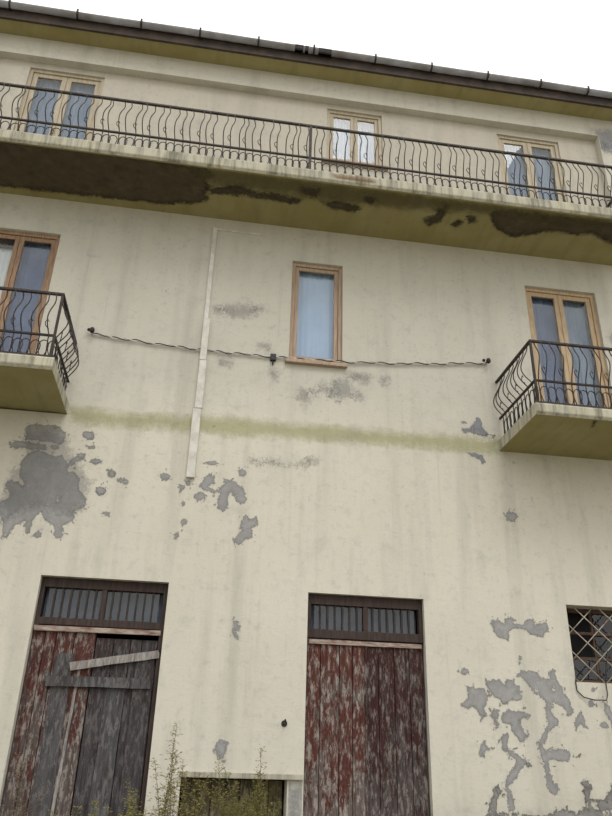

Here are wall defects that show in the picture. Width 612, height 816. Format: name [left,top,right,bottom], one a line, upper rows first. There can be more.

water stain [194,168,612,226]
peeling [461,417,495,438]
peeling [0,420,129,541]
peeling [160,460,248,512]
peeling [232,514,259,548]
peeling [490,614,553,642]
peeling [213,739,229,763]
peeling [461,655,612,816]